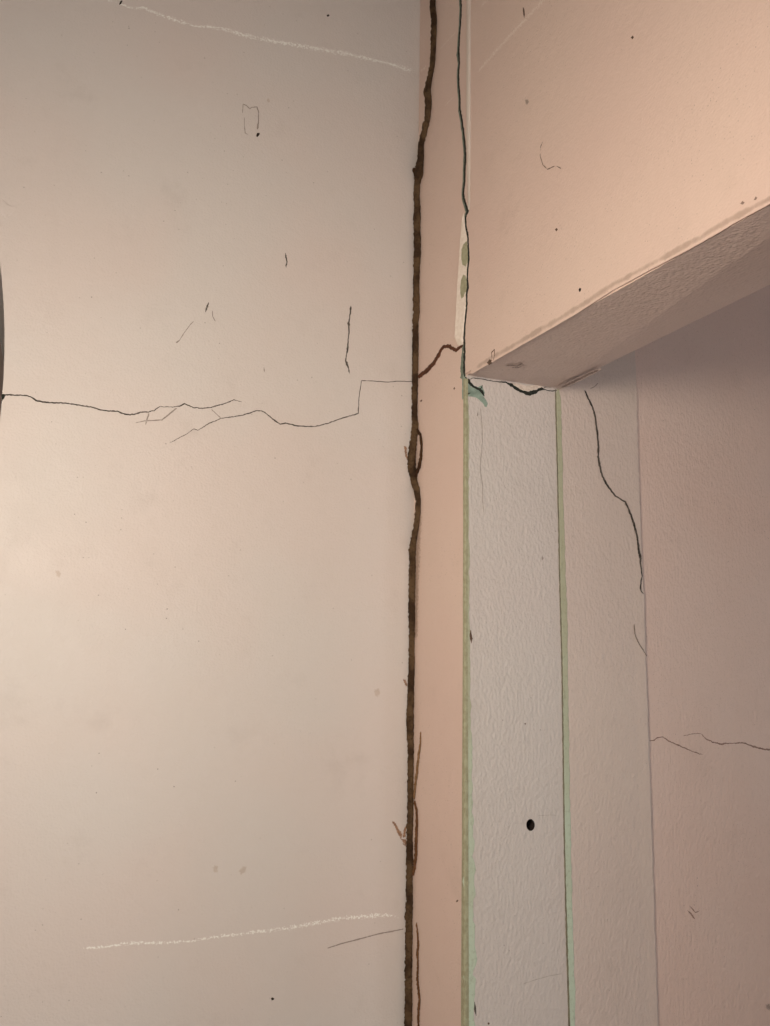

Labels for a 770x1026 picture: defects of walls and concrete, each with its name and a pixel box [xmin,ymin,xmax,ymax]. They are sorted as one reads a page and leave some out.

crack [456,0,557,396]
crack [540,139,562,170]
crack [5,302,412,443]
crack [476,407,484,514]
crack [584,382,643,593]
crack [650,733,770,755]